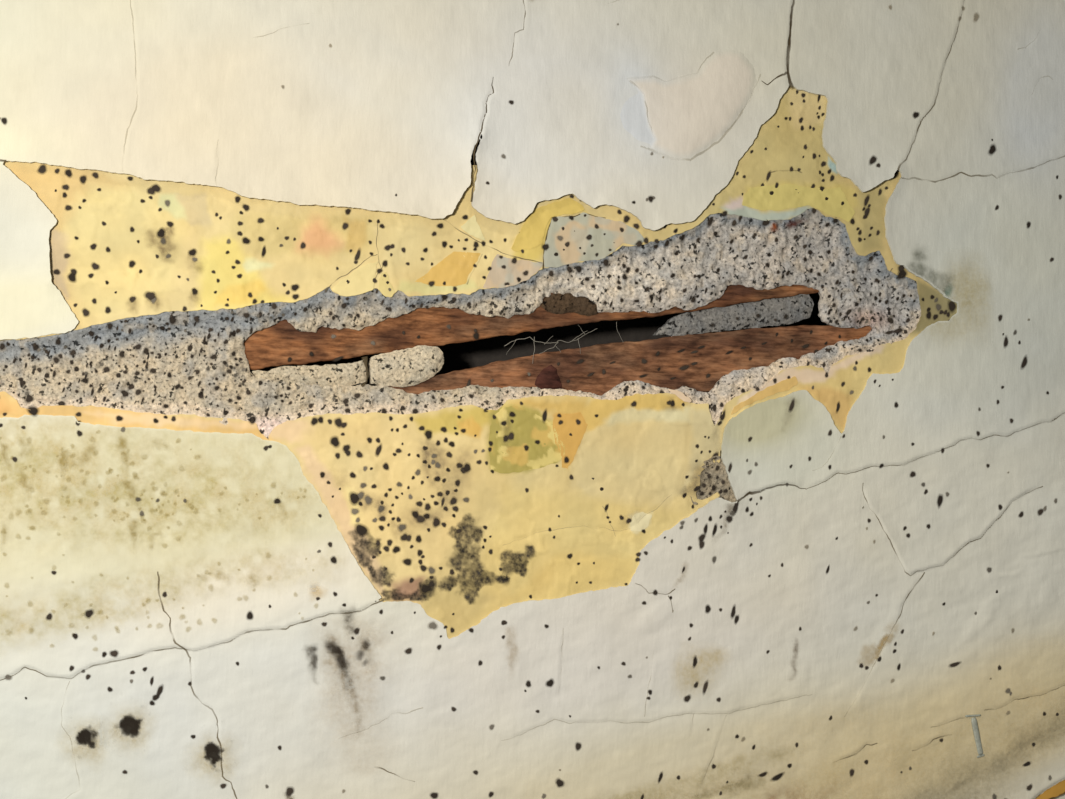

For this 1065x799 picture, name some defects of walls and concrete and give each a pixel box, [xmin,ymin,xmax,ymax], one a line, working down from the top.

crack [762,0,794,89]
damp [38,165,101,210]
damp [226,197,266,278]
damp [350,241,433,311]
crack [470,80,494,202]
damp [542,210,716,310]
damp [1,276,365,446]
spalling [0,86,957,639]
damp [309,388,534,614]
crack [737,465,925,620]
crack [127,572,191,659]
crack [283,600,384,630]